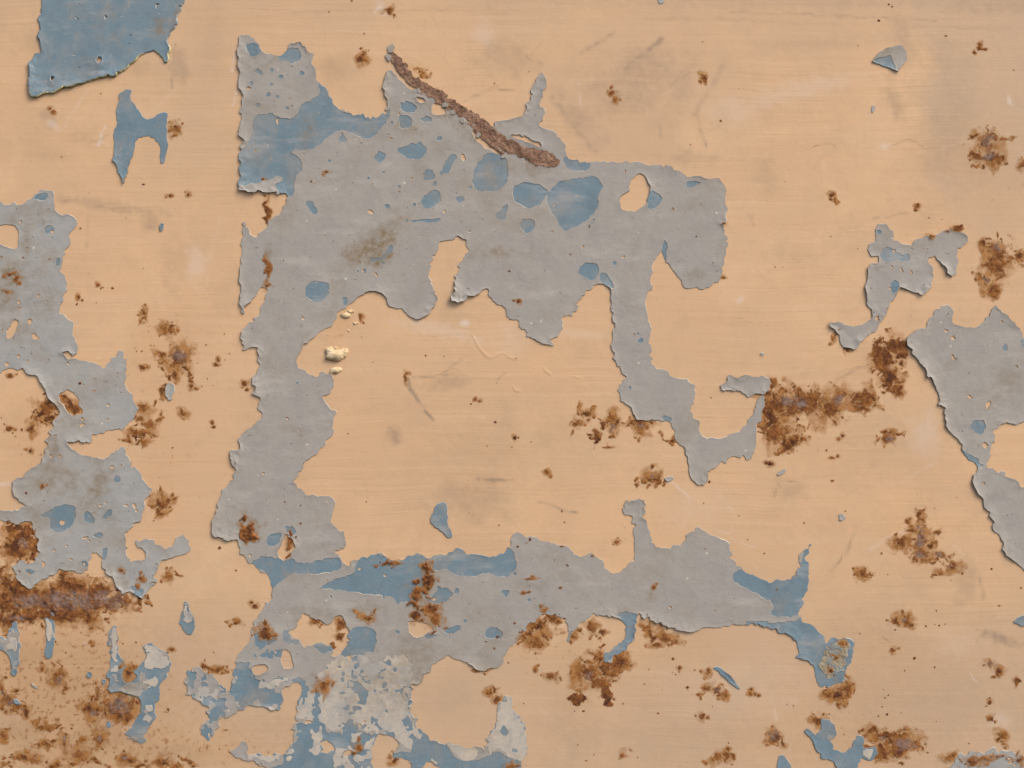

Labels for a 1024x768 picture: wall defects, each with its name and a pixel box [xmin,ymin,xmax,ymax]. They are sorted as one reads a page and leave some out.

peeling [28,0,185,97]
peeling [112,89,168,183]
corrosion [385,44,560,167]
peeling [0,189,191,598]
corrosion [118,321,213,449]
peeling [184,35,855,768]
corrosion [571,402,676,448]
corrosion [756,328,909,466]
peeling [907,305,1024,570]
corrosion [0,518,153,657]
peeling [87,625,172,744]
corrosion [514,605,633,712]